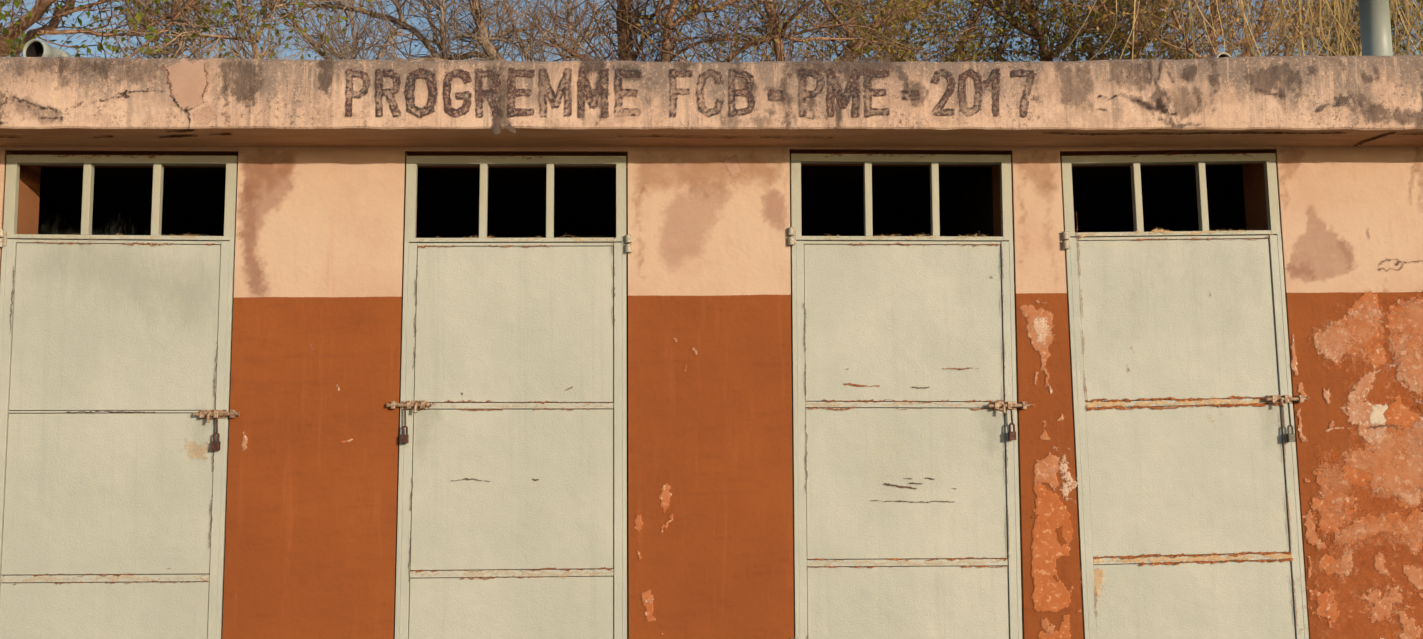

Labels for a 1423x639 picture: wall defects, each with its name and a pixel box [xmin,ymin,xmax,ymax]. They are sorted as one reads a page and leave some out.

spalling [163,58,211,109]
water stain [317,57,334,94]
water stain [746,54,929,131]
water stain [1165,51,1220,129]
water stain [1317,67,1392,122]
rust [803,303,949,410]
peeling [1020,300,1055,394]
rust [1084,375,1286,459]
peeling [1290,291,1423,639]
rust [807,506,1009,568]
peeling [1031,404,1082,639]
rust [1081,495,1293,614]